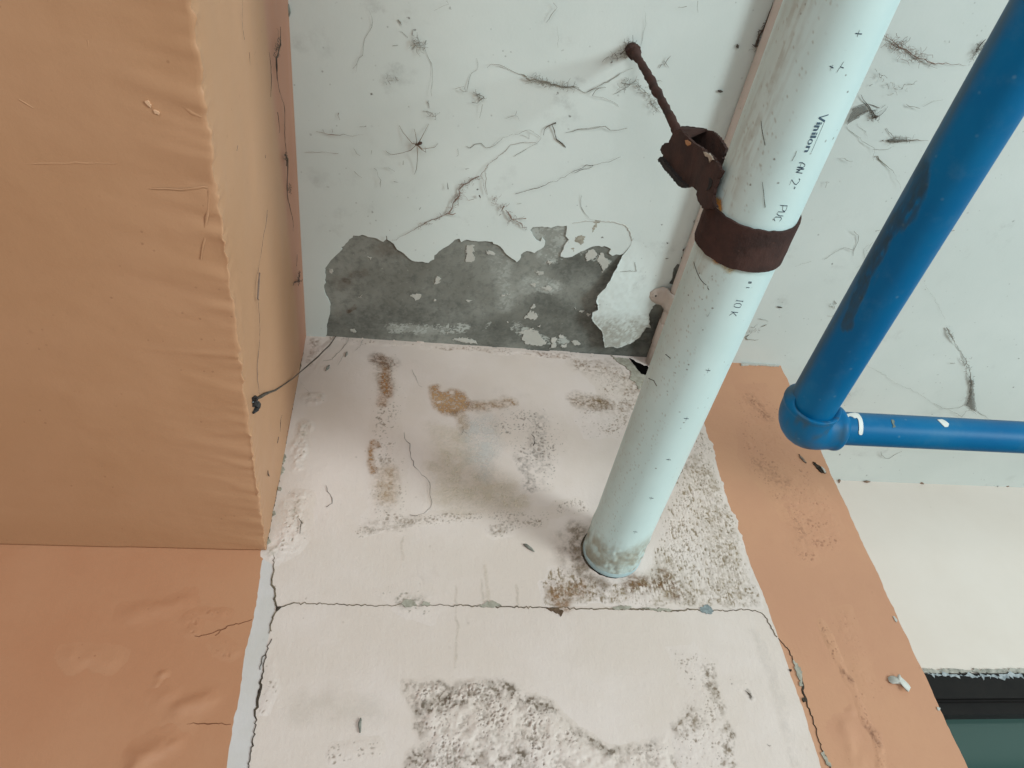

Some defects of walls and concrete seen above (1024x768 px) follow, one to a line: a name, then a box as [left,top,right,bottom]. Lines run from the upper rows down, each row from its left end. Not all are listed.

corrosion [373,357,392,397]
corrosion [431,385,515,414]
spalling [301,220,679,540]
leakage [570,528,604,586]
crack [191,440,832,768]